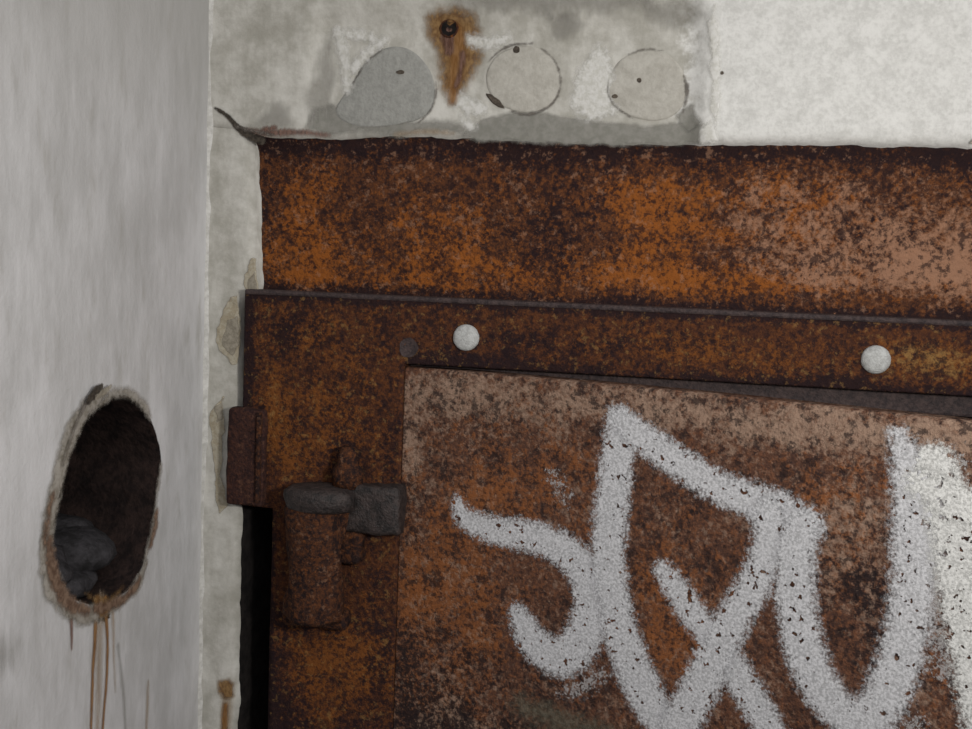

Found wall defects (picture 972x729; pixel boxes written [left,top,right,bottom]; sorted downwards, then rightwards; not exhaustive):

corrosion [427,7,481,104]
spalling [39,388,162,625]
corrosion [90,596,116,729]
corrosion [218,680,234,729]